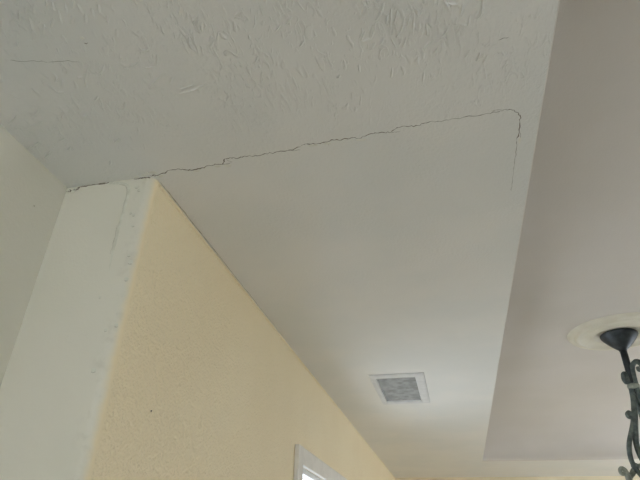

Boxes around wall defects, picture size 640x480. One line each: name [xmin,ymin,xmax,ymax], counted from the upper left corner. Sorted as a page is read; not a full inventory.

crack [66,182,109,193]
crack [134,109,521,326]